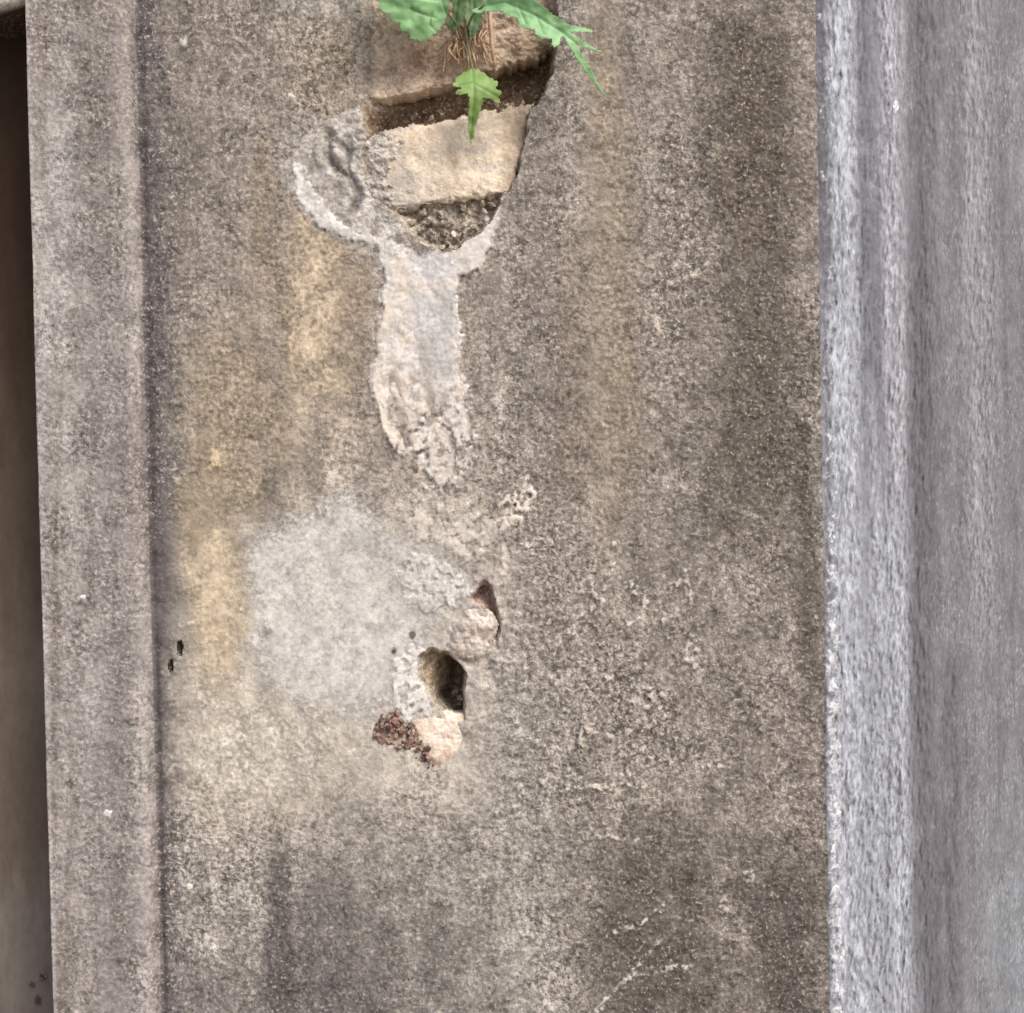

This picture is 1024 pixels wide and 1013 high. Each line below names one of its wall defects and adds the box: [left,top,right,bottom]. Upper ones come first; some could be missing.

damp [169,337,357,814]
damp [256,208,367,398]
spalling [269,0,560,769]